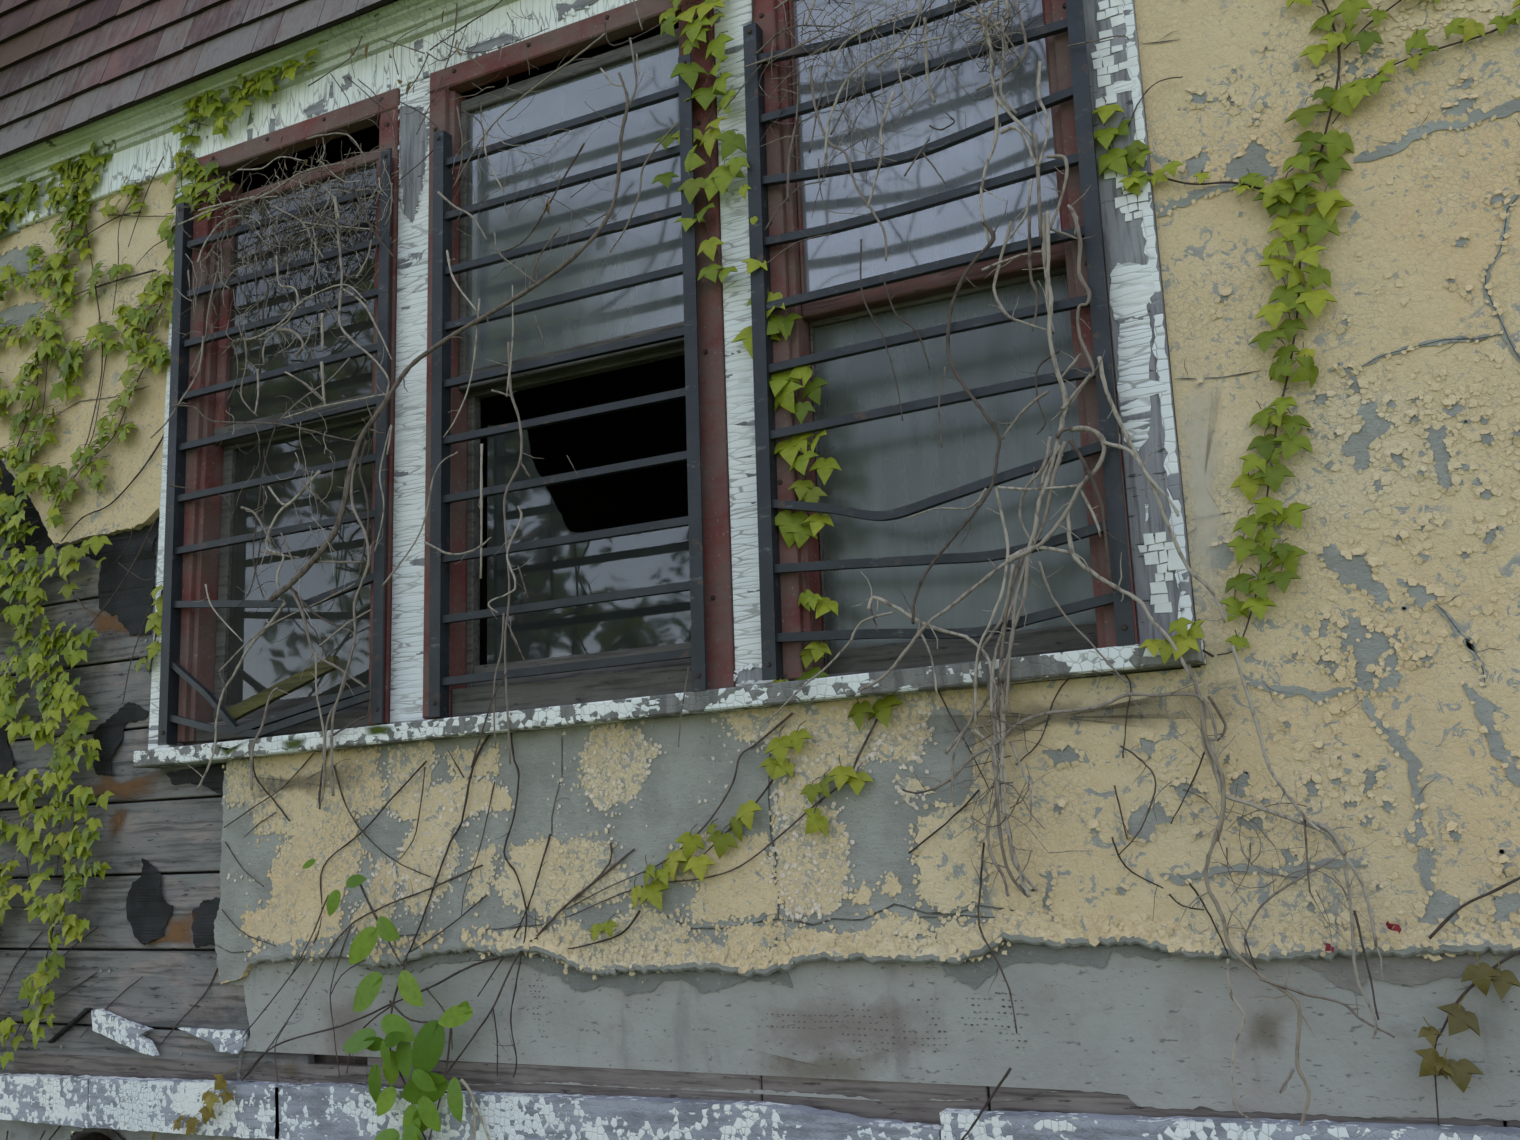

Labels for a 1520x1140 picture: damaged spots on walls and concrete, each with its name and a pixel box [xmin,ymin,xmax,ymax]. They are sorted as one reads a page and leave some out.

peeling [554,0,597,21]
peeling [1091,0,1135,108]
peeling [1177,66,1284,190]
peeling [1104,168,1148,222]
crack [1157,165,1282,217]
crack [1353,99,1520,367]
crack [1177,358,1261,380]
peeling [1121,352,1520,936]
crack [1430,594,1520,787]
peeling [214,692,1066,996]
crack [1243,674,1438,897]
spalling [932,941,1173,990]